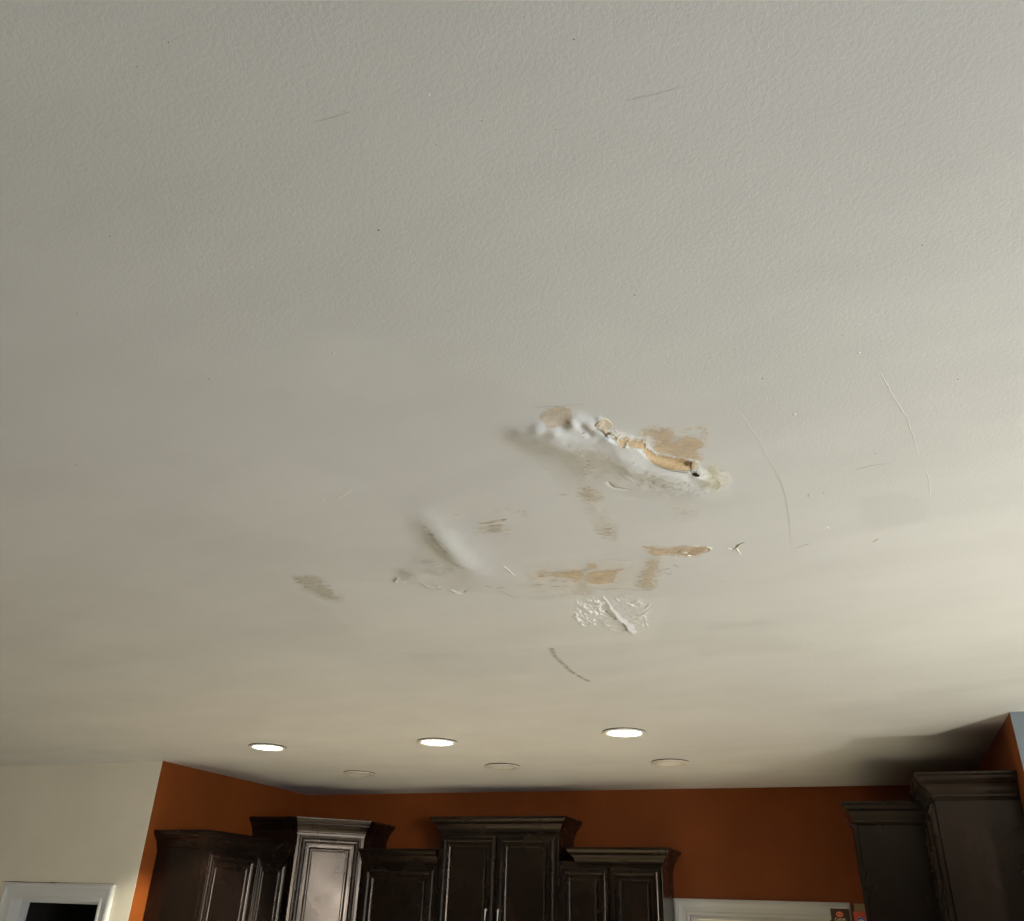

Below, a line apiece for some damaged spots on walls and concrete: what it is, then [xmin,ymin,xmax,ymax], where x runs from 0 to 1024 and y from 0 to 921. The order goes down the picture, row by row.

peeling [571,595,652,635]